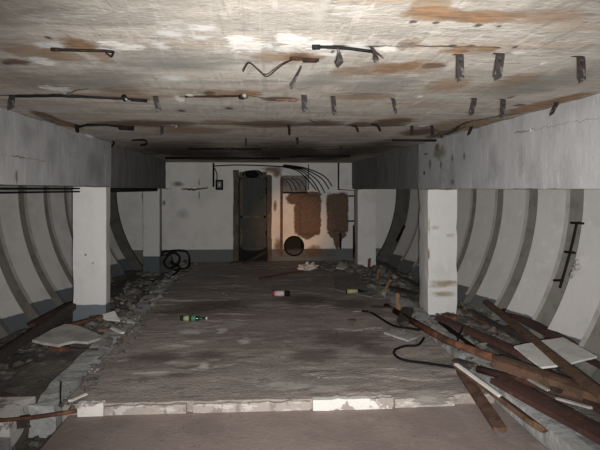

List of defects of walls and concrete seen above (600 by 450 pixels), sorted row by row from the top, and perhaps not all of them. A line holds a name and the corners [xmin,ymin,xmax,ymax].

corrosion [402,0,580,23]
corrosion [3,39,108,64]
corrosion [256,53,322,61]
corrosion [337,60,443,75]
peeling [286,192,348,249]